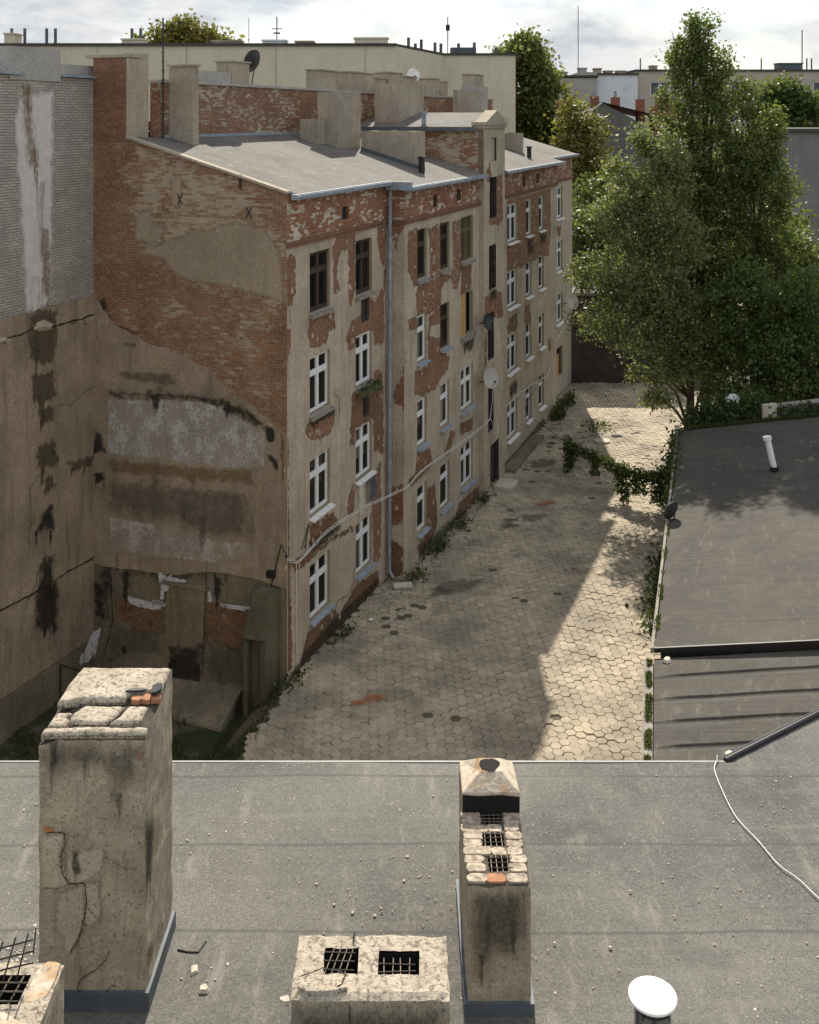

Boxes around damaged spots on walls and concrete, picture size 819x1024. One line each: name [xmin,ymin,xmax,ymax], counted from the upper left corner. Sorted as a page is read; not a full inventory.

damp [14,90,58,429]
peeling [134,210,296,306]
crack [7,308,135,349]
damp [35,433,253,547]
damp [110,372,275,442]
spalling [281,219,474,675]
damp [35,557,59,643]
crack [0,557,113,657]
spalling [114,572,186,634]
spalling [205,591,250,652]
crack [45,832,93,954]
crack [77,949,116,992]